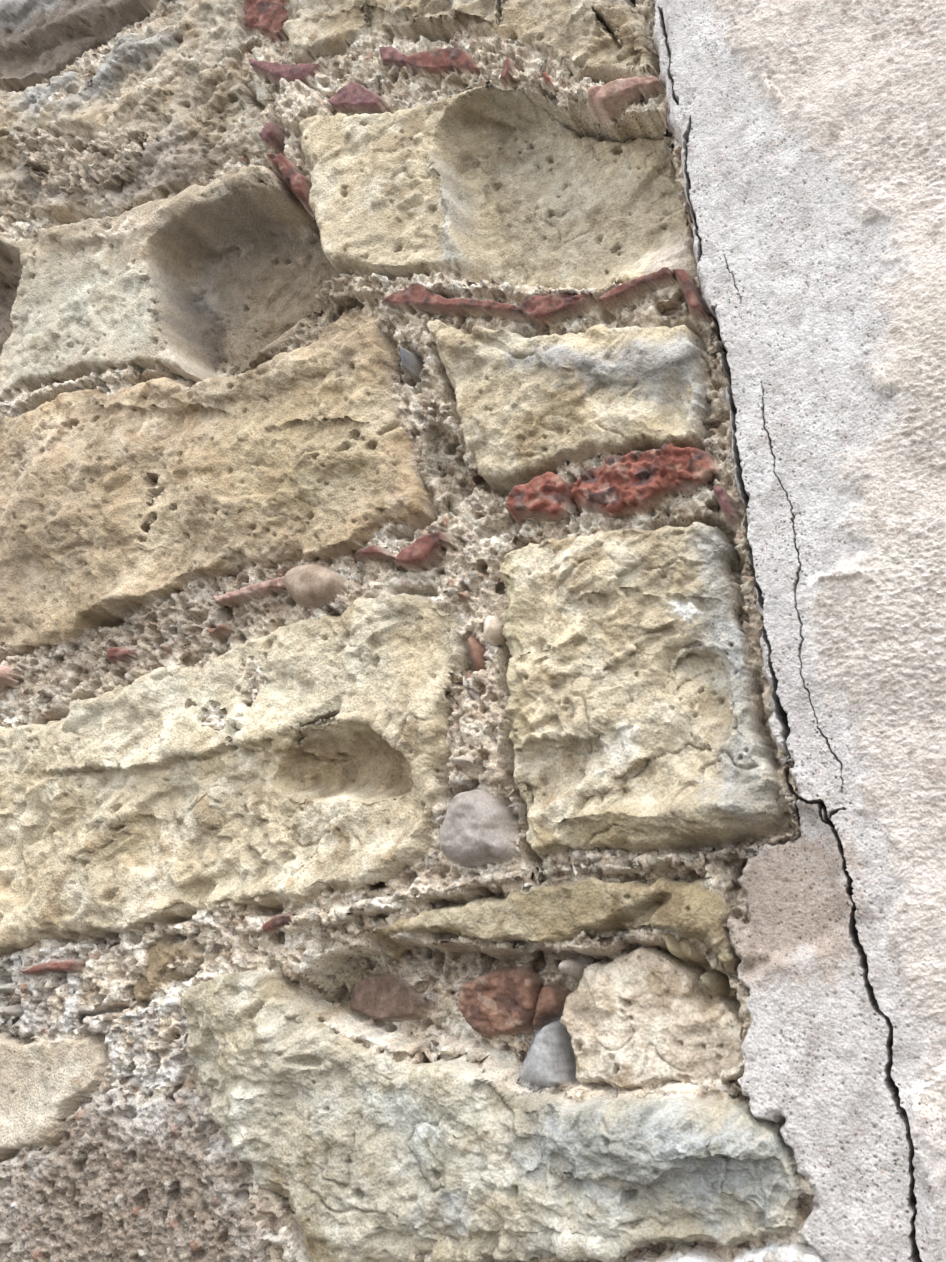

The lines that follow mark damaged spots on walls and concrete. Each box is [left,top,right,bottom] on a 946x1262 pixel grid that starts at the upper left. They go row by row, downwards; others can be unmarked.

crack [653,8,922,1262]